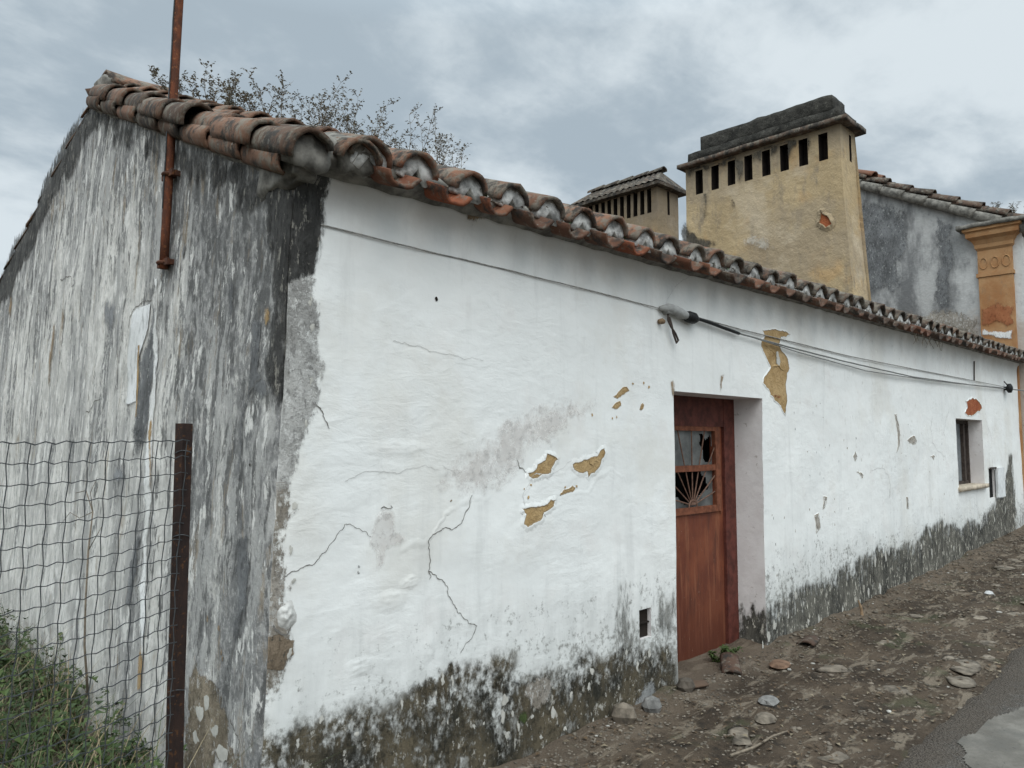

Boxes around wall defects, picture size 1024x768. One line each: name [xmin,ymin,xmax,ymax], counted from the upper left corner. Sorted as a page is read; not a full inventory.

water stain [0,109,330,479]
water stain [862,203,907,292]
water stain [125,300,158,656]
flaking render [266,273,325,694]
crack [285,524,371,577]
crack [428,496,477,650]
flaking render [519,444,608,533]
flaking render [612,382,650,419]
flaking render [760,328,790,416]
water stain [738,455,1017,649]
flaking render [964,397,982,417]
water stain [260,609,676,768]